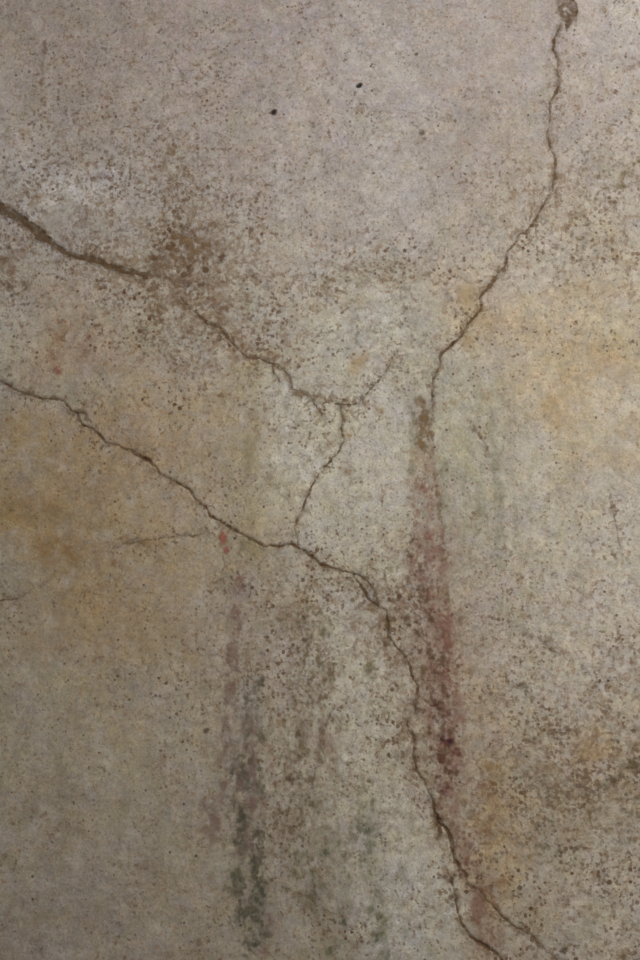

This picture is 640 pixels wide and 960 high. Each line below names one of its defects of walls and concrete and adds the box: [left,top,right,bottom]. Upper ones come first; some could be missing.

crack [0,202,558,960]
crack [431,26,561,410]